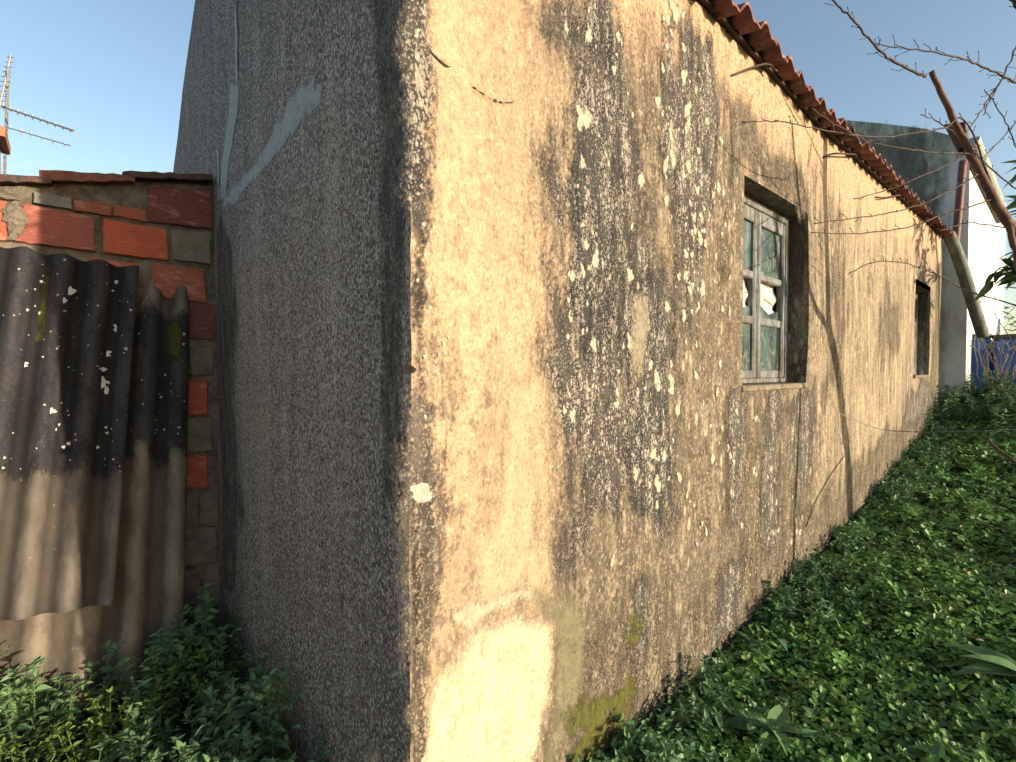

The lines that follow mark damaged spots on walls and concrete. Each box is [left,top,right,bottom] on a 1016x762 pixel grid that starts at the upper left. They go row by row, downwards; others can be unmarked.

leakage [366,0,457,672]
flaking render [405,367,584,762]
leakage [526,0,809,599]
leakage [575,213,942,760]